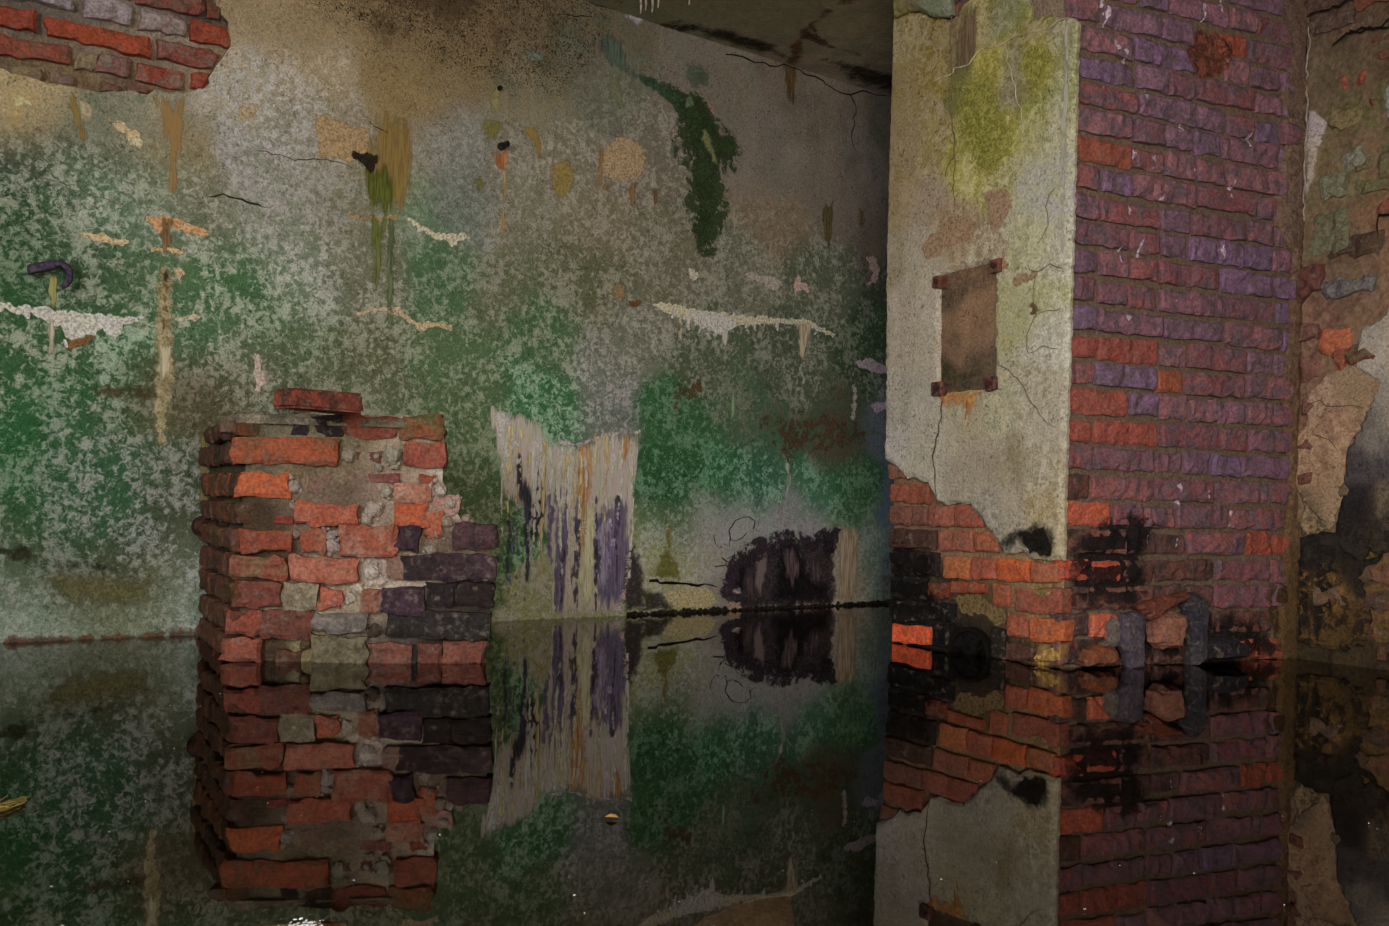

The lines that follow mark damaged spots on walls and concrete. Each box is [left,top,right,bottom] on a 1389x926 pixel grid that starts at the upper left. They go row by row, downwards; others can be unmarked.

damp [0,215,209,445]
flaking render [0,0,231,95]
rust [155,97,184,192]
peeling [315,114,370,162]
damp [349,165,470,331]
peeling [599,137,646,205]
damp [653,302,836,396]
crack [726,54,887,149]
flaking render [1298,0,1389,304]
crack [1302,0,1389,220]
damp [491,406,892,615]
peeling [1296,307,1389,661]